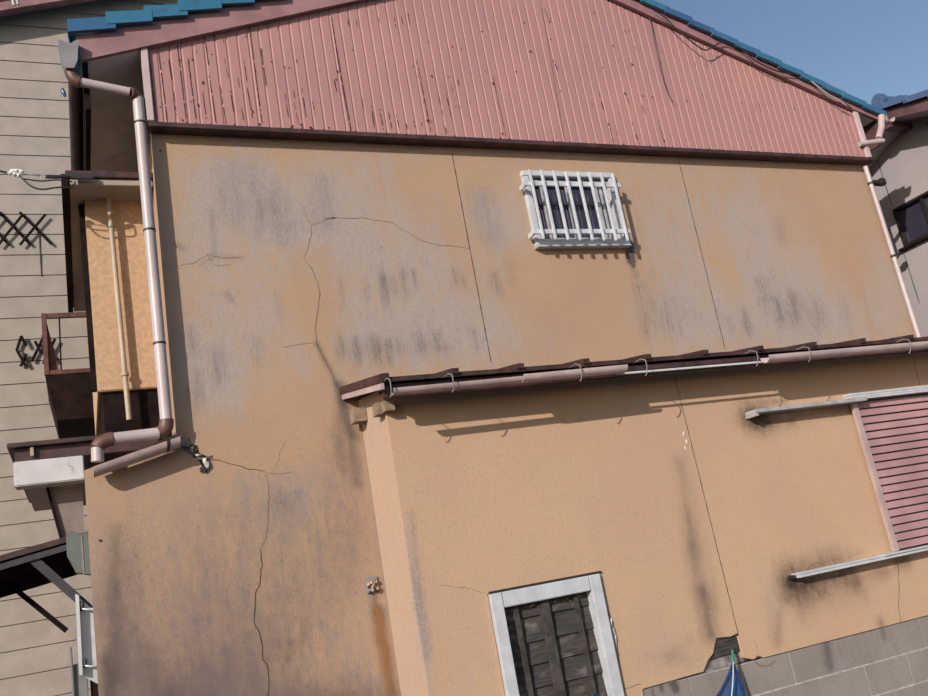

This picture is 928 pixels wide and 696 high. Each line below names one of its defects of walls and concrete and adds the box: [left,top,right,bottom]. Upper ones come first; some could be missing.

crack [285,199,465,384]
leakage [626,240,635,267]
crack [208,441,290,692]
spalling [697,634,758,674]